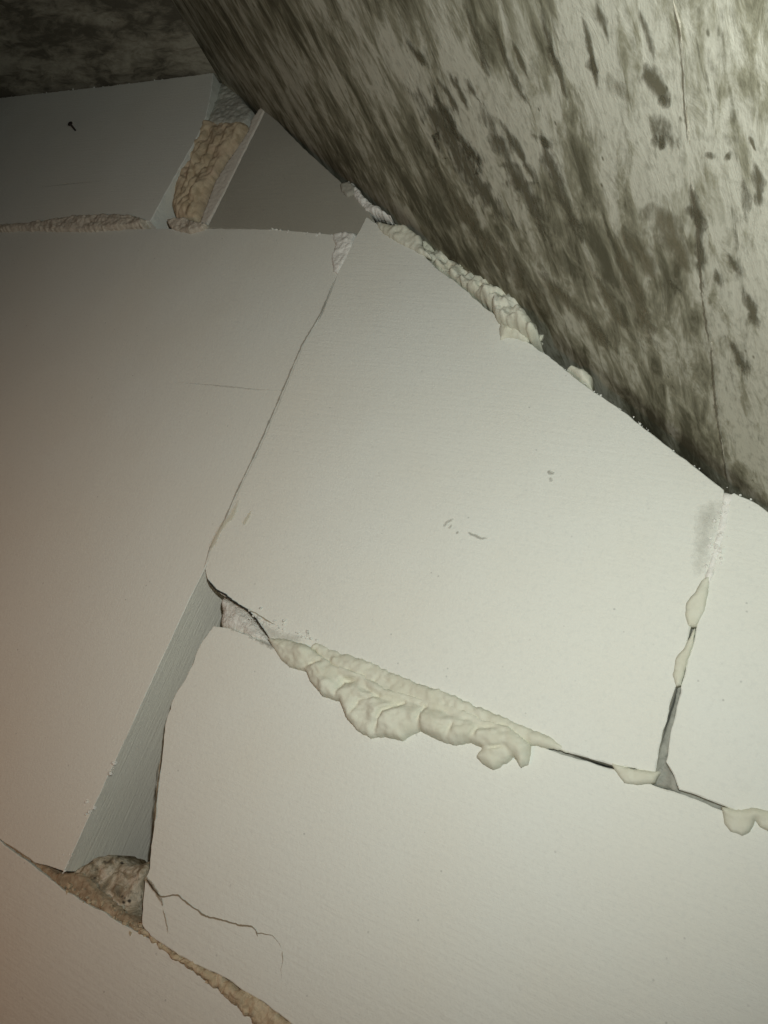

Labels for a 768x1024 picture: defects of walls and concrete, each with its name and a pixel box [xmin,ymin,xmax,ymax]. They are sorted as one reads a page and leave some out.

damp [496,32,527,100]
damp [542,18,566,94]
damp [583,22,598,84]
damp [643,67,667,106]
damp [416,76,515,227]
damp [485,121,544,229]
damp [540,137,583,243]
damp [743,166,763,204]
damp [657,193,704,268]
damp [745,295,757,323]
crack [206,291,330,636]
crack [145,877,283,963]